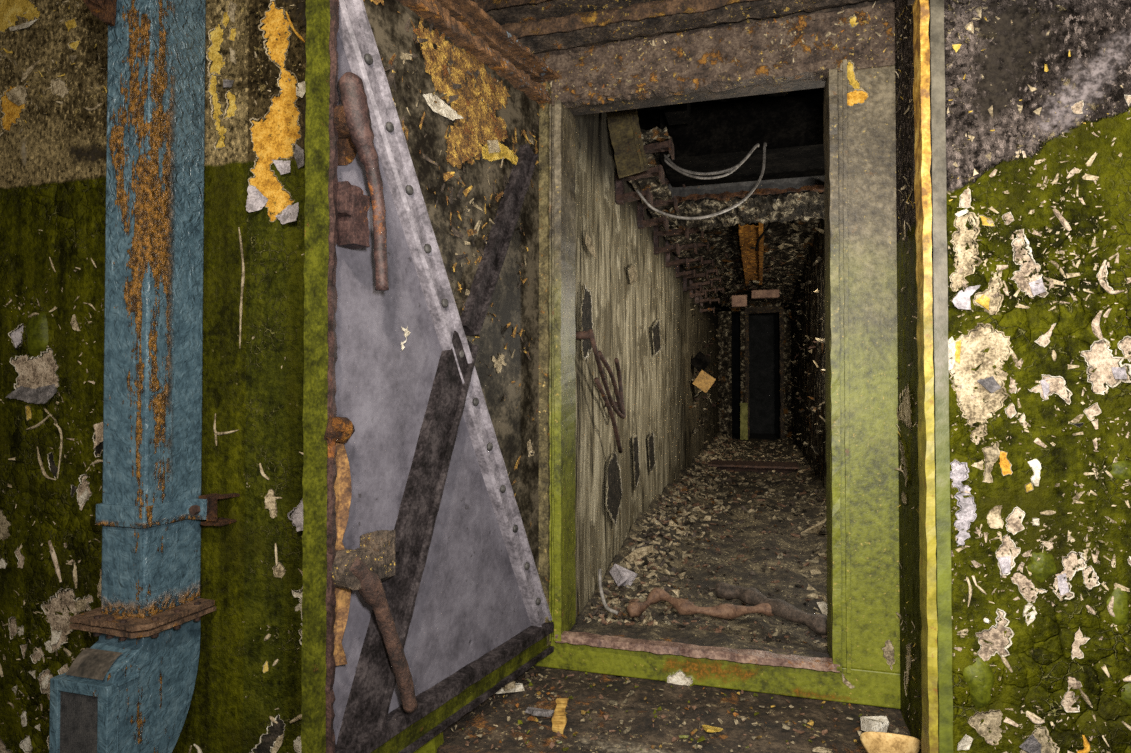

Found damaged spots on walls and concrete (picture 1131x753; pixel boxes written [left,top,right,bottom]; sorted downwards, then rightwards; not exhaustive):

peeling [206,0,306,224]
peeling [423,93,518,167]
peeling [5,322,63,480]
peeling [947,168,1131,672]
peeling [0,508,26,570]
peeling [70,422,103,512]
peeling [259,463,303,532]
peeling [8,540,102,701]
peeling [271,543,303,647]
peeling [957,705,1004,753]
peeling [1017,715,1063,753]
peeling [1059,675,1093,714]